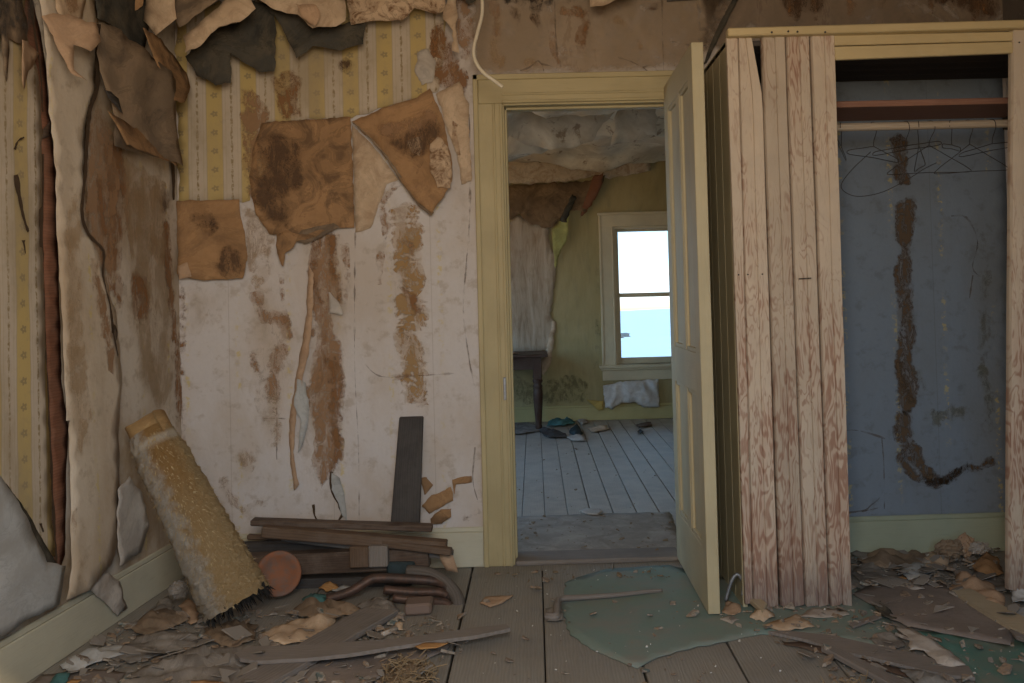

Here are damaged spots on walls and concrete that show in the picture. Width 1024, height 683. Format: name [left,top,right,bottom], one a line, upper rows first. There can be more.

peeling [41,0,101,80]
peeling [143,28,190,103]
peeling [42,120,51,139]
peeling [102,86,178,166]
peeling [407,137,452,188]
damp [889,134,910,185]
peeling [276,223,339,266]
damp [376,188,428,405]
damp [252,291,293,399]
damp [306,234,350,484]
damp [893,199,994,489]